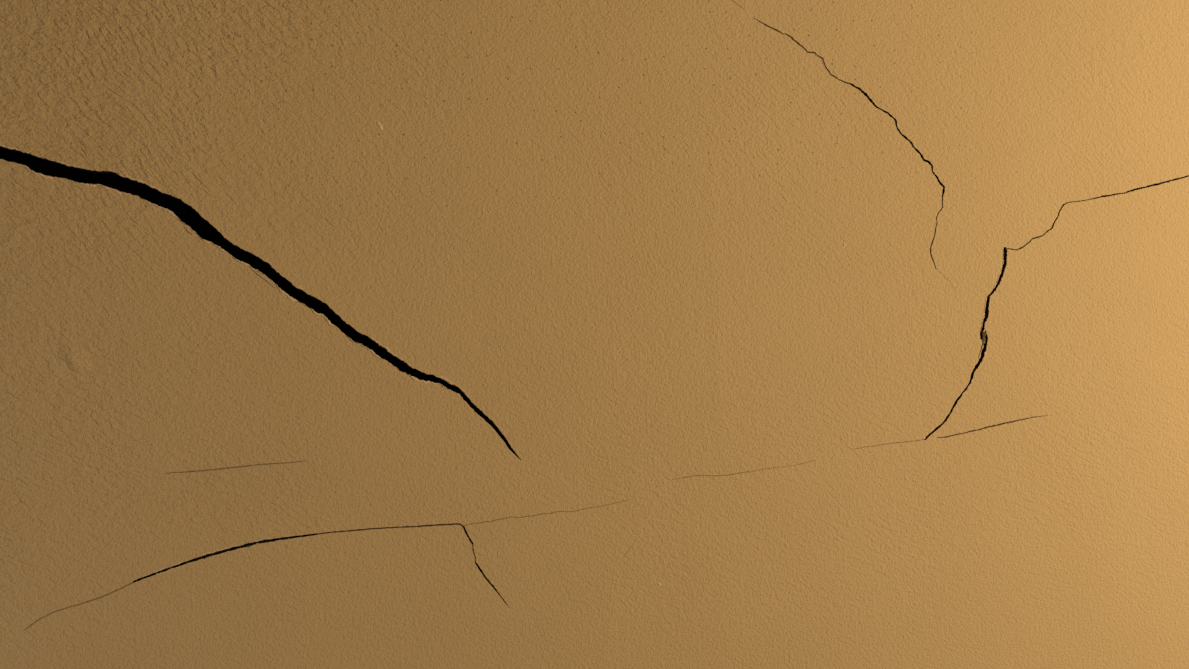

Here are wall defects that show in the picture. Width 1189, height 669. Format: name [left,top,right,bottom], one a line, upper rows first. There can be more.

crack [732,0,955,291]
crack [0,144,521,460]
crack [855,175,1189,449]
crack [165,461,302,474]
crack [23,500,627,631]